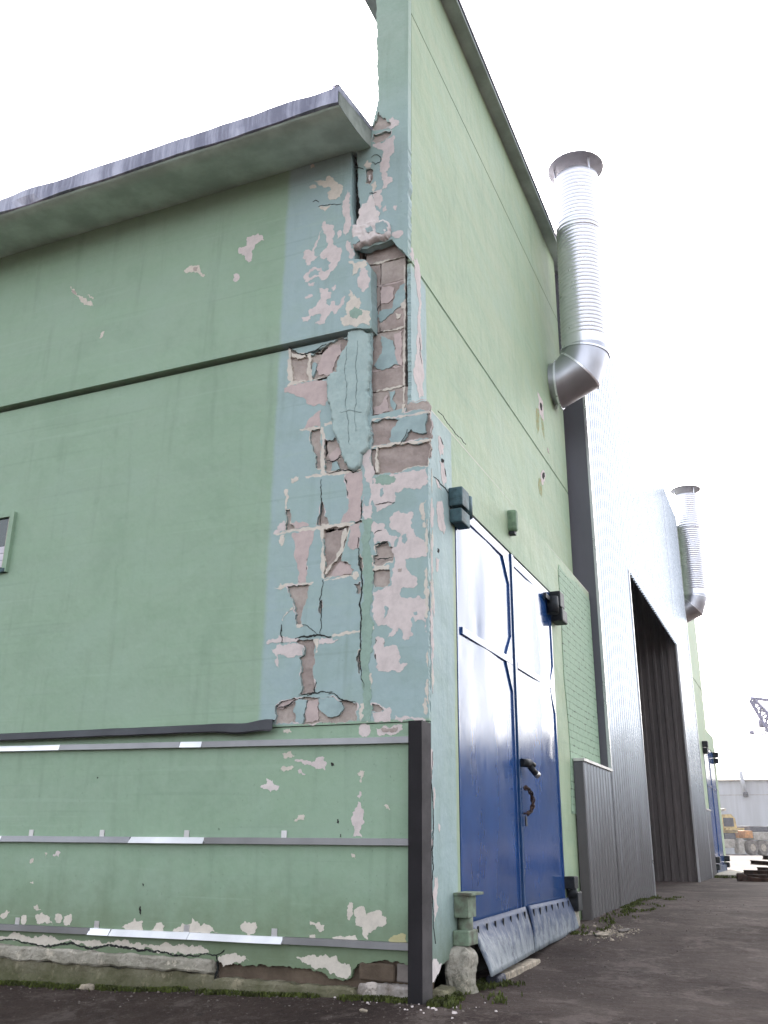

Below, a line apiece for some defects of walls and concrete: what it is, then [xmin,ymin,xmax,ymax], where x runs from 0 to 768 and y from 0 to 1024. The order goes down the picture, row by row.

crack [355,158,363,219]
peeling [238,234,263,262]
flaking render [272,115,447,737]
crack [316,479,330,525]
crack [266,502,364,683]
peeling [260,778,279,792]
peeling [281,751,327,775]
peeling [351,770,365,837]
peeling [0,905,246,967]
peeling [240,921,257,935]
peeling [309,902,387,940]
peeling [296,954,351,979]